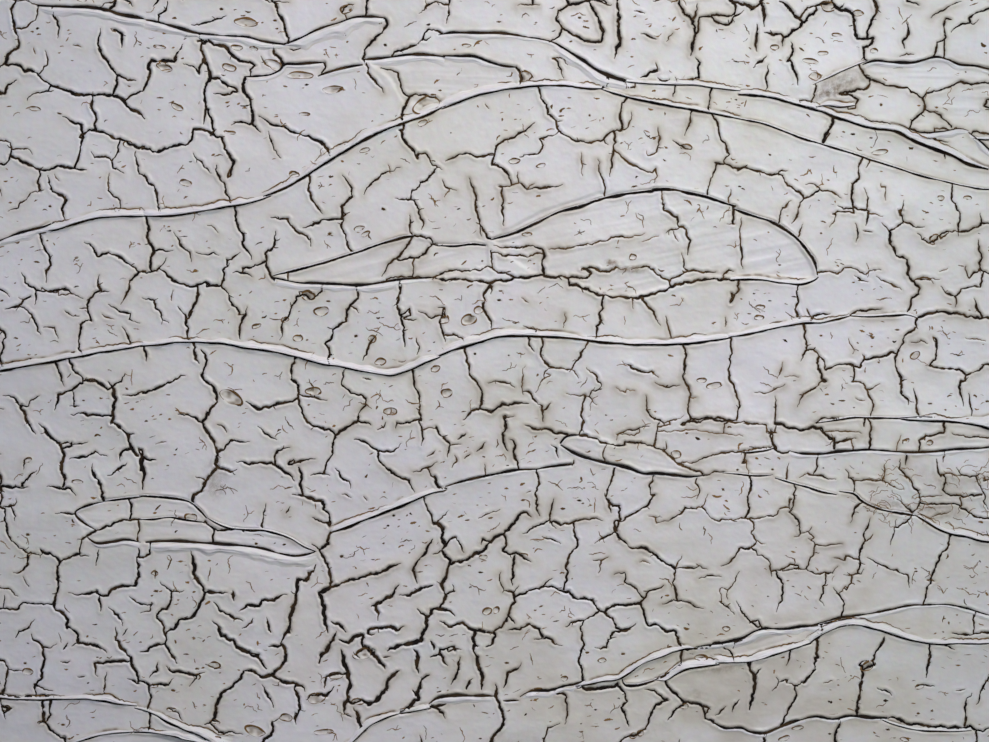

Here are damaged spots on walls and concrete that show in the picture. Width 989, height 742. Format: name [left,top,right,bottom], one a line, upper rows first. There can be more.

crack [671,0,989,147]
crack [719,571,763,628]
crack [747,662,761,710]
crack [772,612,989,742]